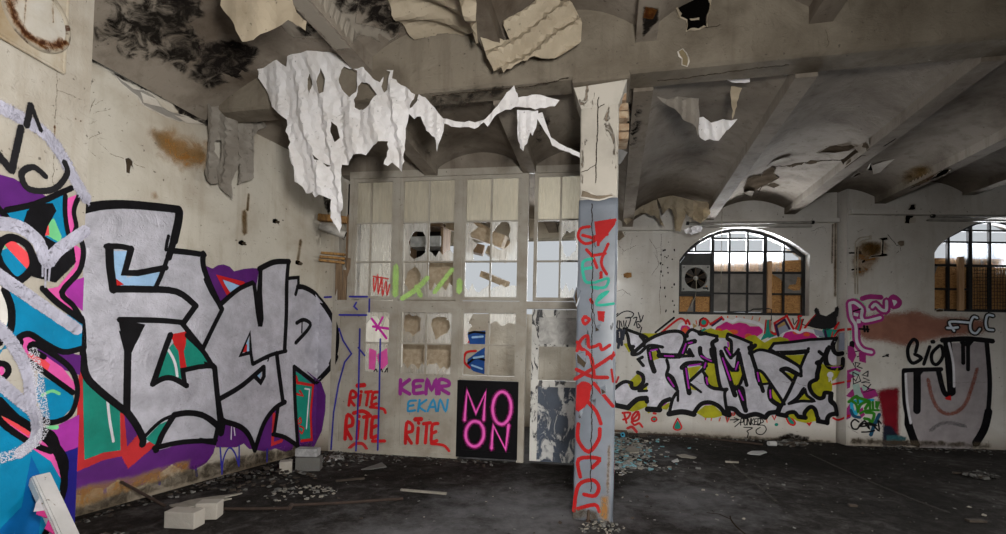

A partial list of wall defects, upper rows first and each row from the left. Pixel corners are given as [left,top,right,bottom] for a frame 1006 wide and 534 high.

rust [8,0,68,50]
leakage [94,0,259,88]
peeling [112,73,267,199]
leakage [174,104,208,126]
peeling [220,0,582,232]
flaking render [618,93,629,149]
peeling [658,78,750,141]
peeling [617,196,710,247]